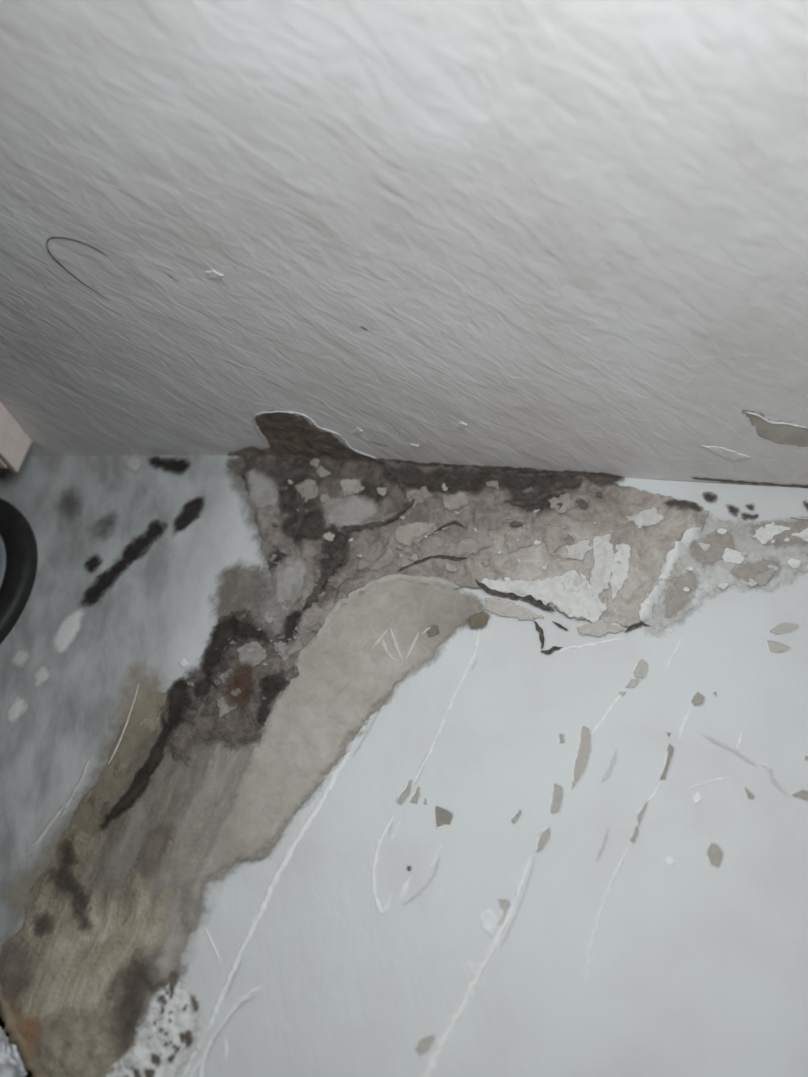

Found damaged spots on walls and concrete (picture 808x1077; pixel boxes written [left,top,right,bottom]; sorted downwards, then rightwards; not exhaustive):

water stain [149,456,190,473]
flaking render [227,410,808,654]
peeling [619,659,649,696]
peeling [691,691,718,706]
water stain [0,459,317,1077]
water stain [225,679,403,872]
peeling [396,778,454,829]
peeling [536,726,592,852]
peeling [660,732,675,780]
peeling [791,789,808,801]
peeling [707,843,724,868]
peeling [106,972,199,1077]